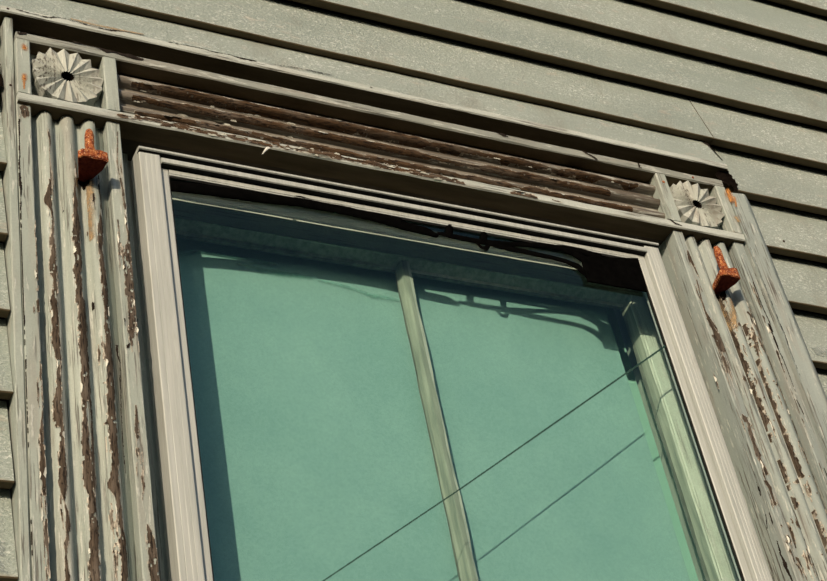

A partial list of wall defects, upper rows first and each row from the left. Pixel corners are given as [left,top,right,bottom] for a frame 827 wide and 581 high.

peeling [116,131,140,353]
peeling [117,81,639,212]
peeling [37,127,71,581]
peeling [72,155,128,581]
peeling [134,405,145,501]
peeling [145,524,160,581]
peeling [687,250,827,581]